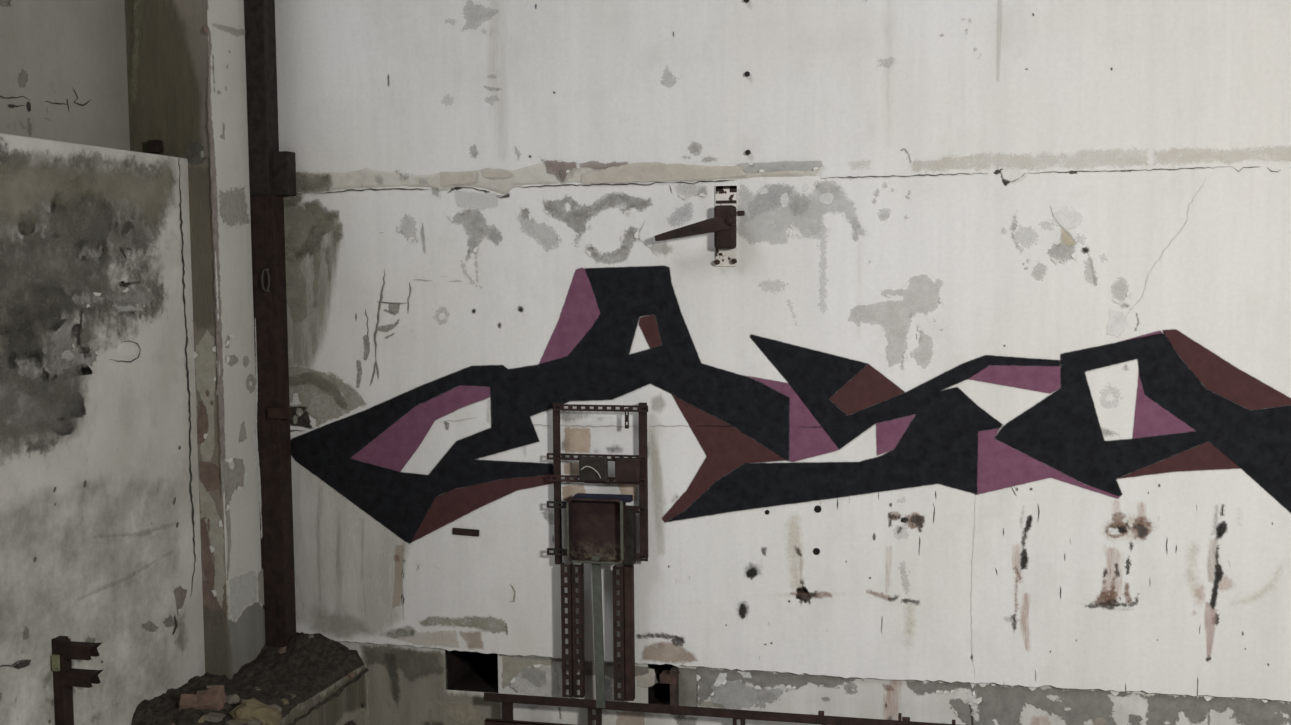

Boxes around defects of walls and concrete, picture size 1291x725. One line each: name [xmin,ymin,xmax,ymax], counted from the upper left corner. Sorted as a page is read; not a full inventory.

spalling [529,155,628,182]
crack [823,172,988,180]
water stain [0,0,212,453]
spalling [519,193,651,263]
crack [1024,167,1291,335]
peeling [183,26,262,608]
peeling [849,275,942,368]
corrosion [1107,514,1151,550]
corrosion [793,580,830,606]
spalling [499,654,658,701]
spalling [696,666,864,710]
spalling [904,680,1291,725]